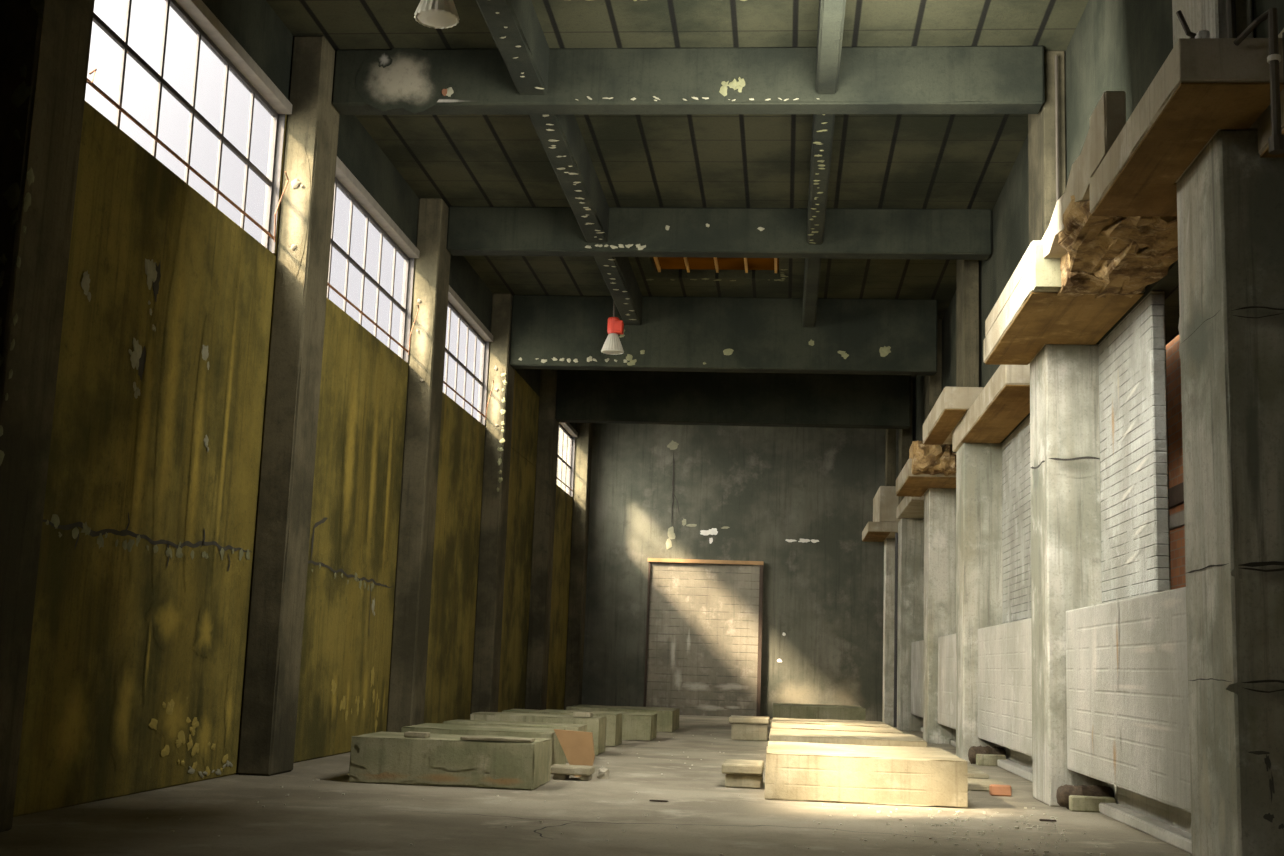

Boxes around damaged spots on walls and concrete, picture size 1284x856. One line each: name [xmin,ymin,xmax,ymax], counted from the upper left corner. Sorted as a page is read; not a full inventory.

leakage [356,48,488,113]
spalling [683,77,799,101]
spalling [145,259,161,331]
spalling [129,337,146,399]
crack [1031,448,1100,496]
crack [43,513,251,571]
crack [1187,555,1284,592]
crack [1189,675,1284,709]